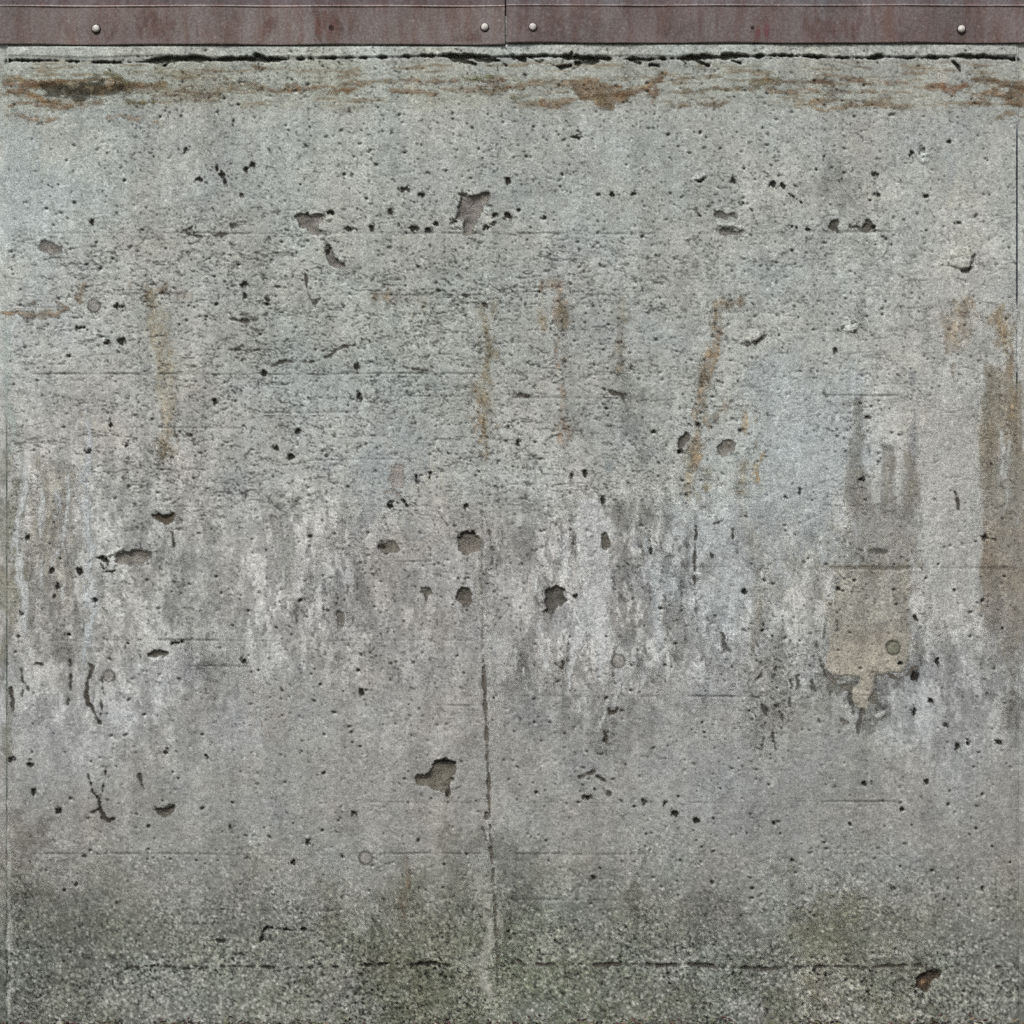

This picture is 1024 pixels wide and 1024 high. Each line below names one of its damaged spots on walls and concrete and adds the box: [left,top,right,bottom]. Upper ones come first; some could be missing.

crack [4,53,1019,72]
rust [4,71,168,122]
rust [391,71,667,108]
rust [687,76,908,111]
rust [927,78,1024,119]
spalling [450,192,498,236]
leakage [673,353,1024,651]
spalling [544,585,578,613]
crack [67,659,104,724]
peeling [722,621,924,750]
crack [88,771,115,822]
spalling [415,758,460,798]